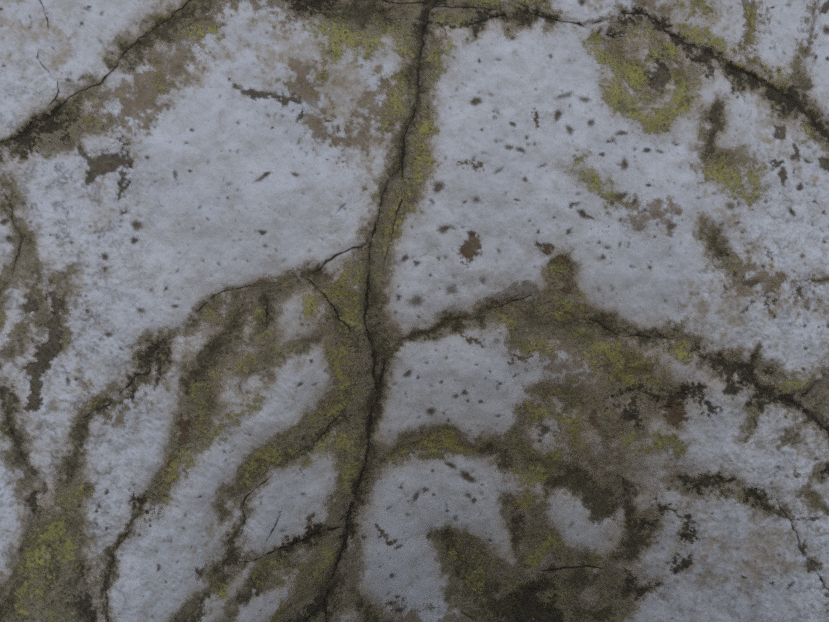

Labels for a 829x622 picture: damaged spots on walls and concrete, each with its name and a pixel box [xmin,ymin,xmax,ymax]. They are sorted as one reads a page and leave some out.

leakage [250,0,289,28]
crack [0,0,191,143]
leakage [95,0,239,135]
crack [5,195,23,271]
crack [193,0,751,622]
leakage [625,194,682,236]
leakage [732,251,821,316]
crack [86,343,164,417]
crack [101,528,132,622]
leakage [273,432,433,622]
leakage [438,493,572,622]
crack [751,486,829,591]